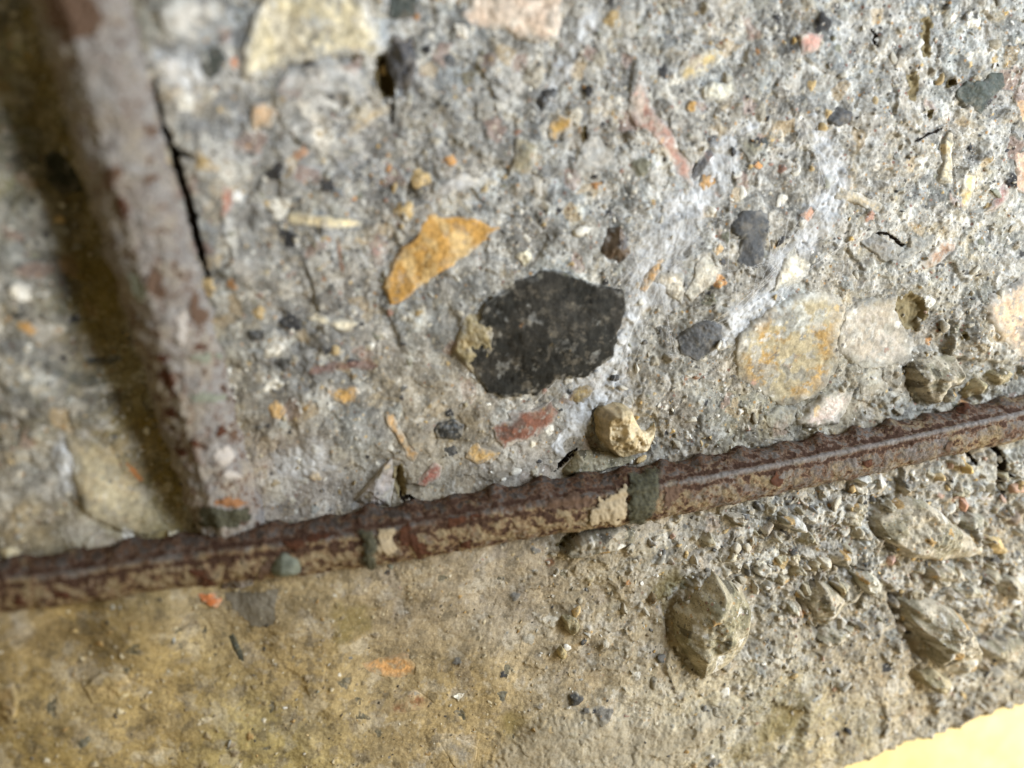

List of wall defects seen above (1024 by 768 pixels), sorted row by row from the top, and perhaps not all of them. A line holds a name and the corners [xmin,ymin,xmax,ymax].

crack [152,76,209,278]
rust [216,425,239,445]
spalling [277,450,323,475]
peeling [563,447,635,476]
spalling [393,463,408,498]
rust [770,472,784,487]
rust [399,522,433,559]
spalling [556,532,579,550]
rust [188,568,217,588]
peeling [198,592,222,608]